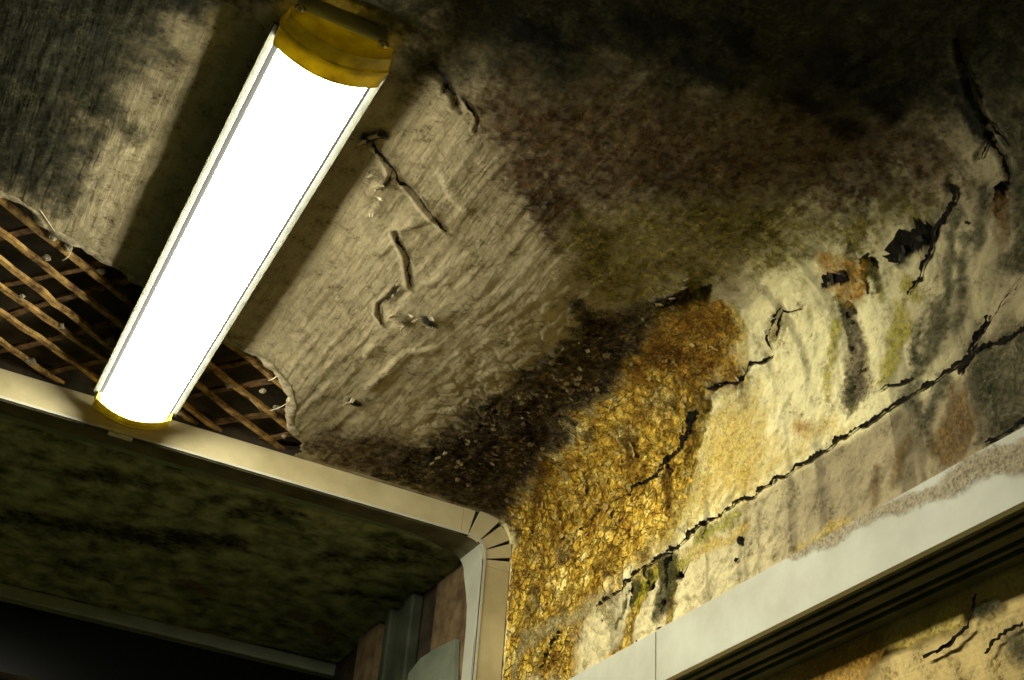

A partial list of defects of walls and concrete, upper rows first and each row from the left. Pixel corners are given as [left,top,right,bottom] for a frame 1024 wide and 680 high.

water stain [466,67,965,277]
flaking render [0,190,145,396]
peeling [883,217,938,266]
flaking render [168,337,302,456]
rust [526,461,551,549]
water stain [303,290,778,680]
rust [577,461,594,499]
rust [630,307,740,519]
crack [576,275,1024,614]
water stain [832,294,870,418]
crack [923,593,977,659]
crack [984,620,1023,654]